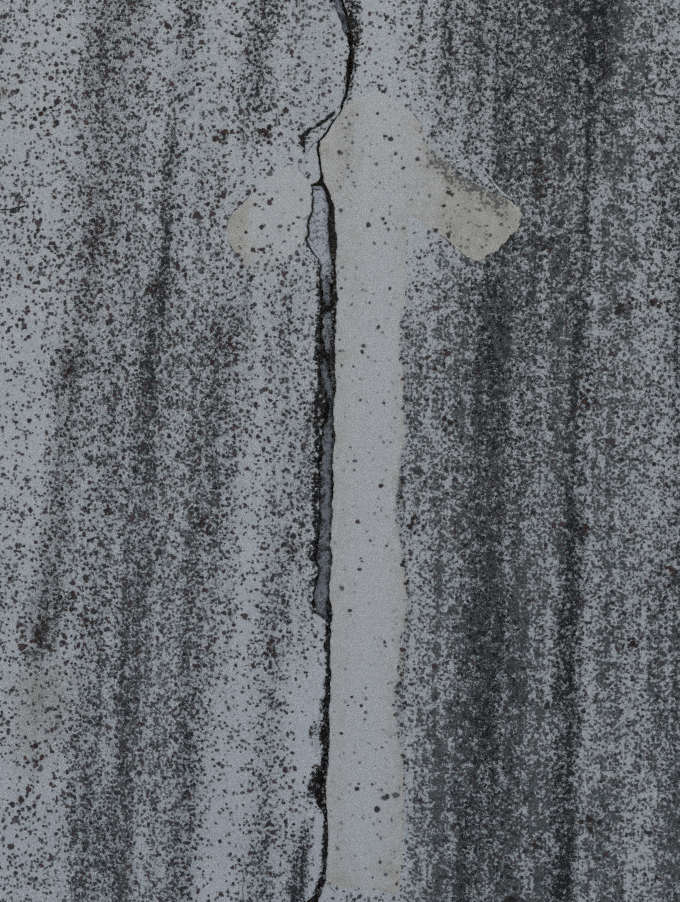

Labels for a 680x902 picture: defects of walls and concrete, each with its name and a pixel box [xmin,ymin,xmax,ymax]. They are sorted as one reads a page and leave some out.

crack [298,0,358,902]